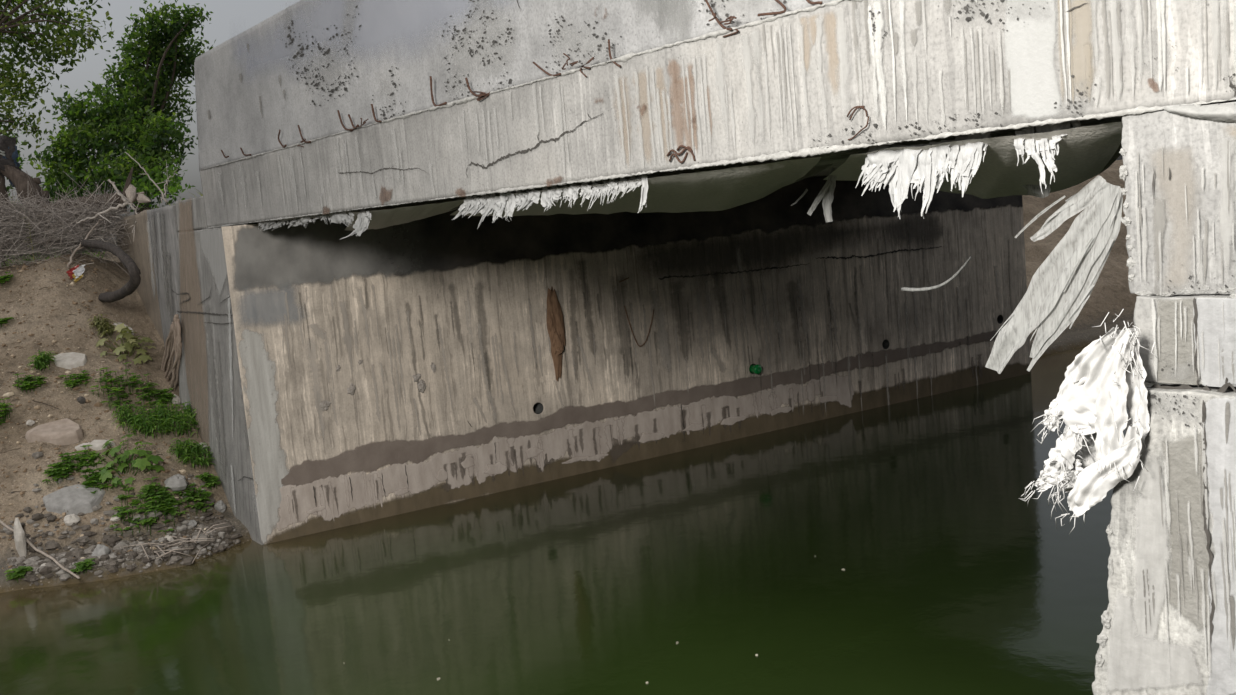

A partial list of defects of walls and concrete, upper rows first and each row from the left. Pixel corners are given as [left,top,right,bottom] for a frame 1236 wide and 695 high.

leakage [237,0,484,98]
crack [466,113,603,178]
leakage [147,152,1031,544]